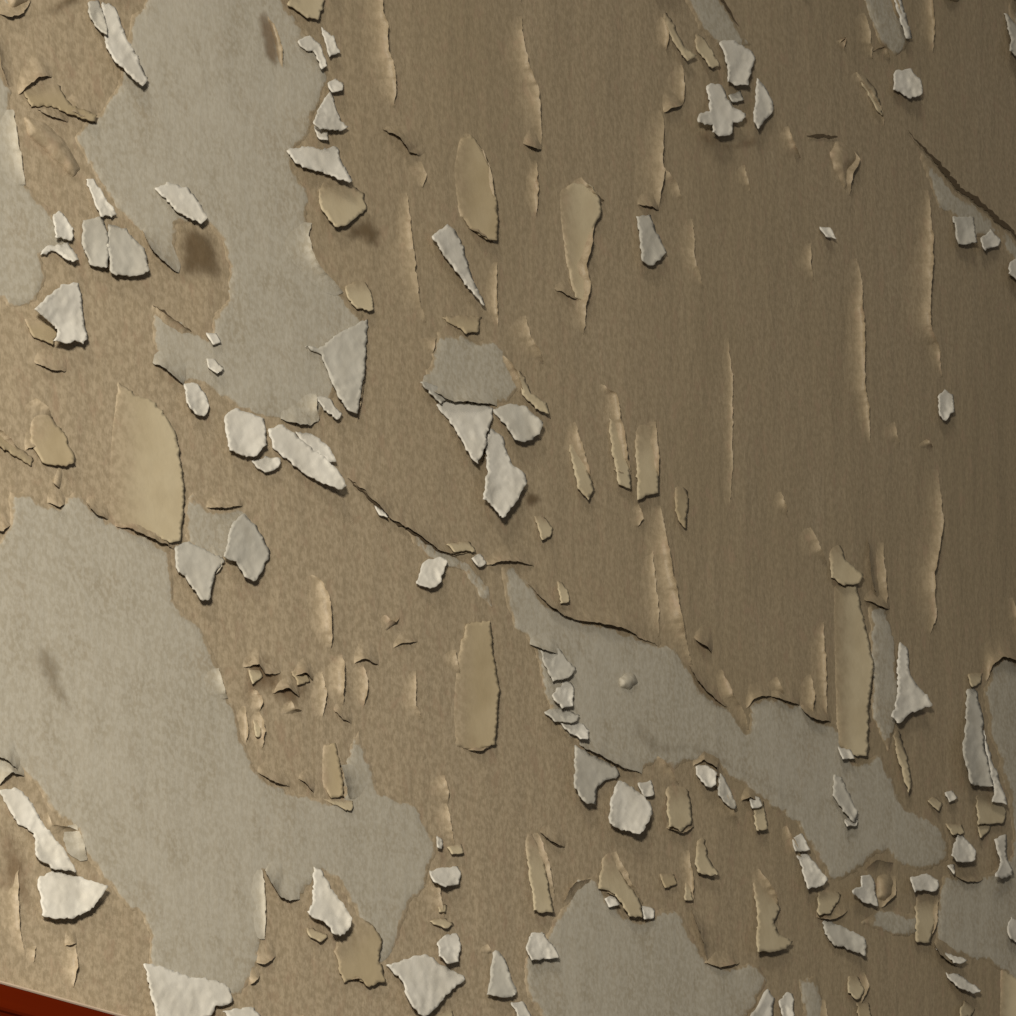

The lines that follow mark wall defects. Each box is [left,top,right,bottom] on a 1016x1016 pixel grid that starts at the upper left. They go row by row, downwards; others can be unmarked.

peeling [361,0,396,108]
peeling [837,0,912,61]
peeling [893,68,923,99]
peeling [0,0,374,490]
peeling [454,133,499,243]
crack [909,132,1016,238]
peeling [420,224,550,518]
peeling [843,258,870,444]
peeling [406,530,492,607]
peeling [0,382,465,1016]
peeling [443,620,500,752]
peeling [480,384,1016,1016]